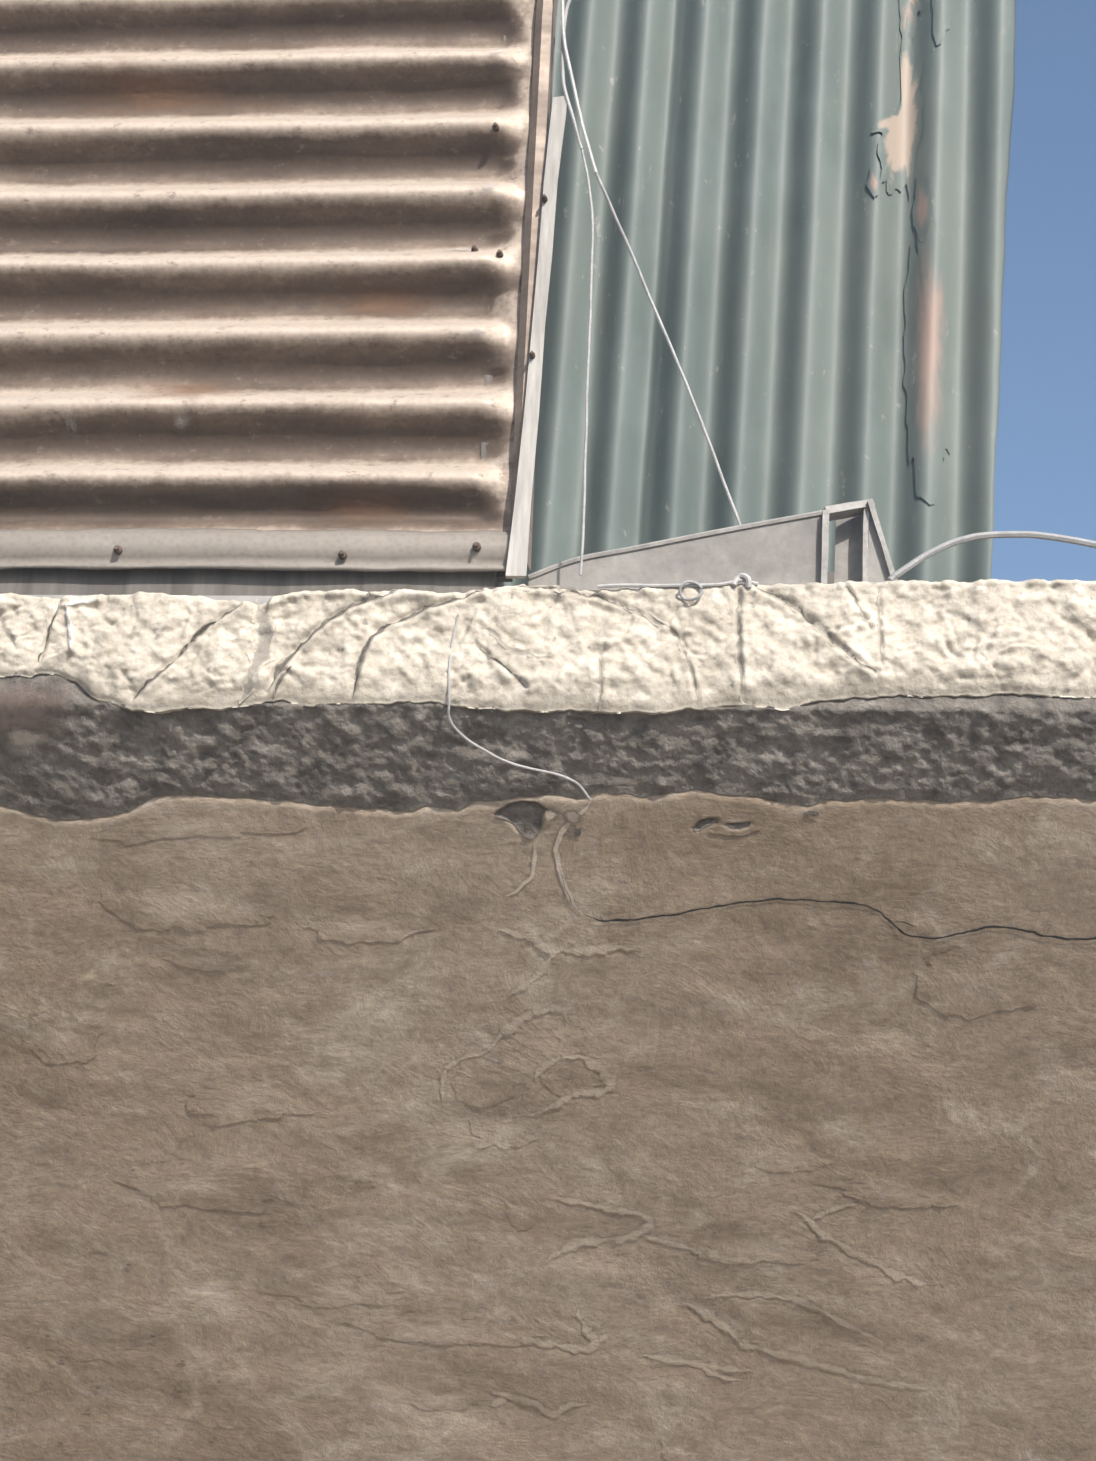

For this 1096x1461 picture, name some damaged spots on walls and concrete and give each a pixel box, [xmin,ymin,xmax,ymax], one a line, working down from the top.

crack [0,602,59,664]
crack [133,584,700,710]
crack [735,586,884,704]
flaking render [0,674,1096,839]
crack [440,797,1096,1117]